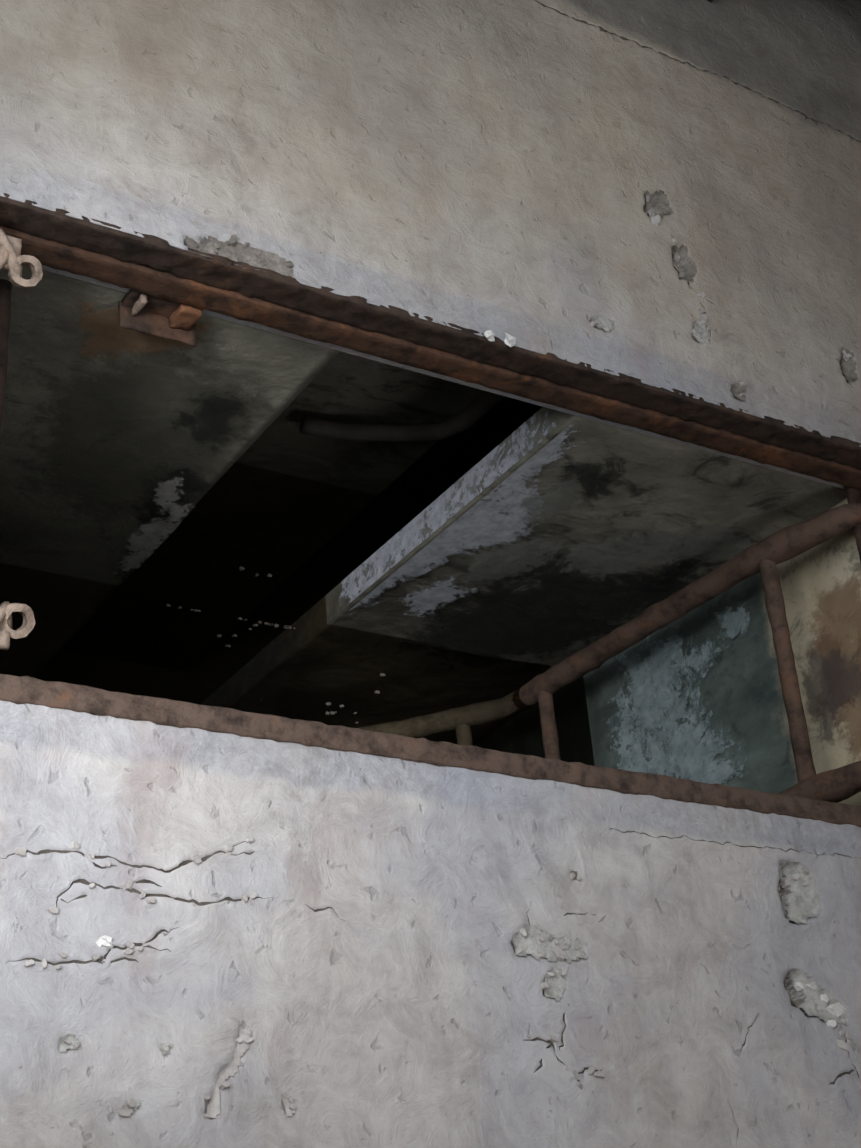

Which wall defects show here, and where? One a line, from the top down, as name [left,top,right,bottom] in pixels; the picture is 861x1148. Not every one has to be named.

spalling [185,234,294,278]
leakage [339,410,719,669]
crack [0,837,274,972]
crack [304,903,346,921]
spalling [778,861,820,924]
spalling [784,969,849,1029]
crack [829,1019,861,1091]